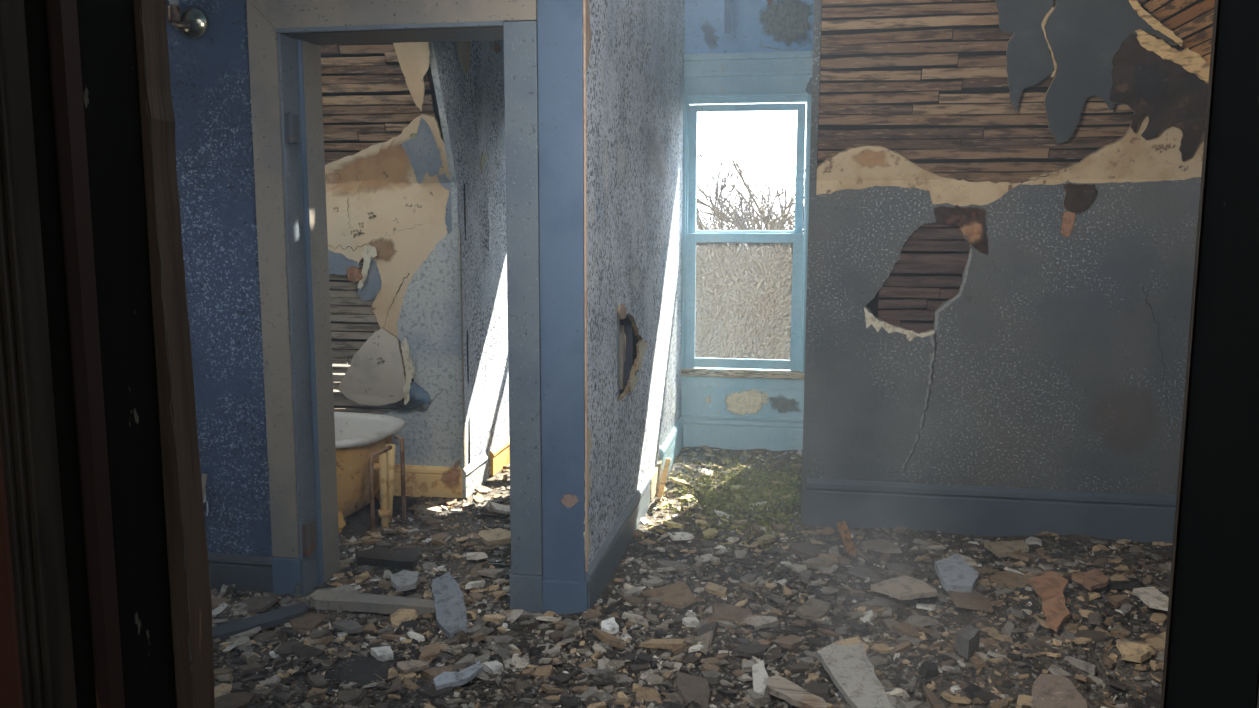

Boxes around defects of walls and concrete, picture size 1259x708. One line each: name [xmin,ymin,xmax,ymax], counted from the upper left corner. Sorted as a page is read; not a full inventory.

flaking render [805,0,1215,206]
peeling [320,45,452,415]
hole [616,304,647,398]
peeling [705,389,769,415]
crack [888,333,937,474]
flaking render [864,222,973,342]